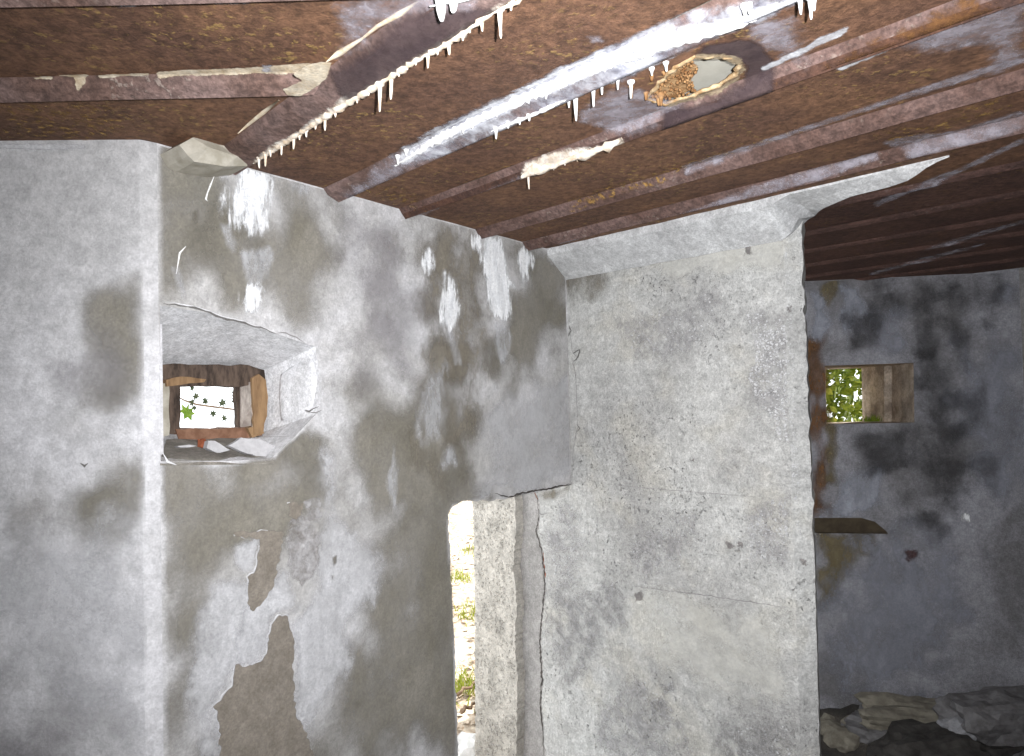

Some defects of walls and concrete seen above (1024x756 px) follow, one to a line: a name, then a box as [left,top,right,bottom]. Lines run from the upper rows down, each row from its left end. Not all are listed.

leakage [161,0,522,322]
leakage [379,0,847,181]
peeling [645,59,744,116]
leakage [87,290,139,401]
leakage [812,285,905,351]
flaking render [211,613,314,756]
flaking render [234,501,322,611]
crack [495,325,581,755]
corrosion [808,339,836,516]
leakage [836,468,881,516]
leakage [831,535,971,692]